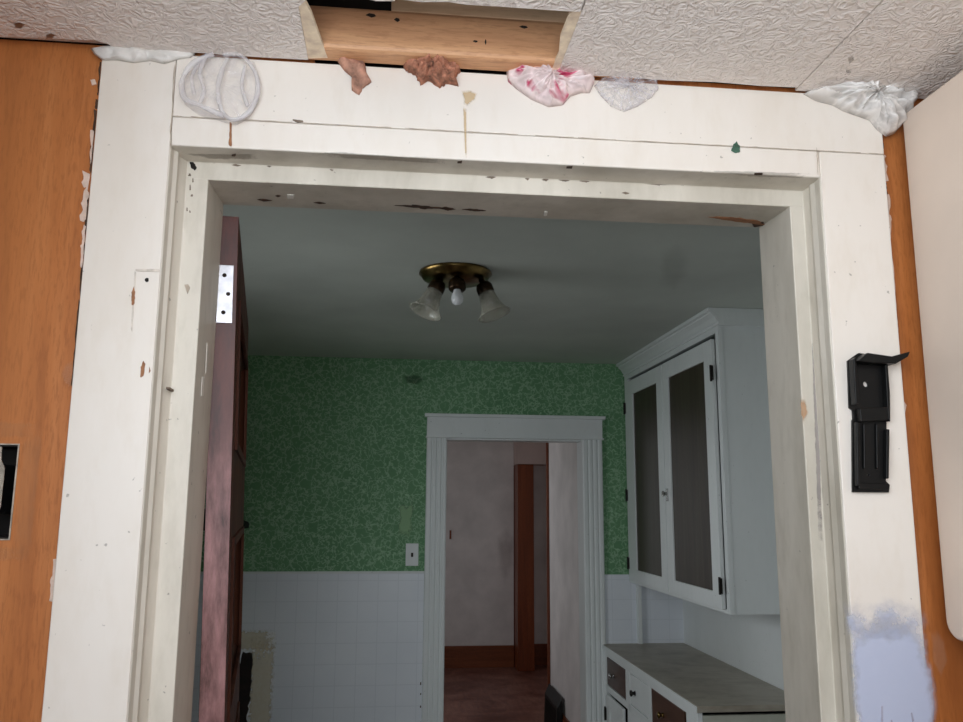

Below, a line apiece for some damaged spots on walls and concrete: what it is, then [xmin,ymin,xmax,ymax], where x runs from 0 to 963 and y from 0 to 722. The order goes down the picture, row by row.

spalling [0,37,110,46]
spalling [299,0,392,65]
spalling [552,11,581,70]
peeling [239,652,254,722]
peeling [848,612,934,722]